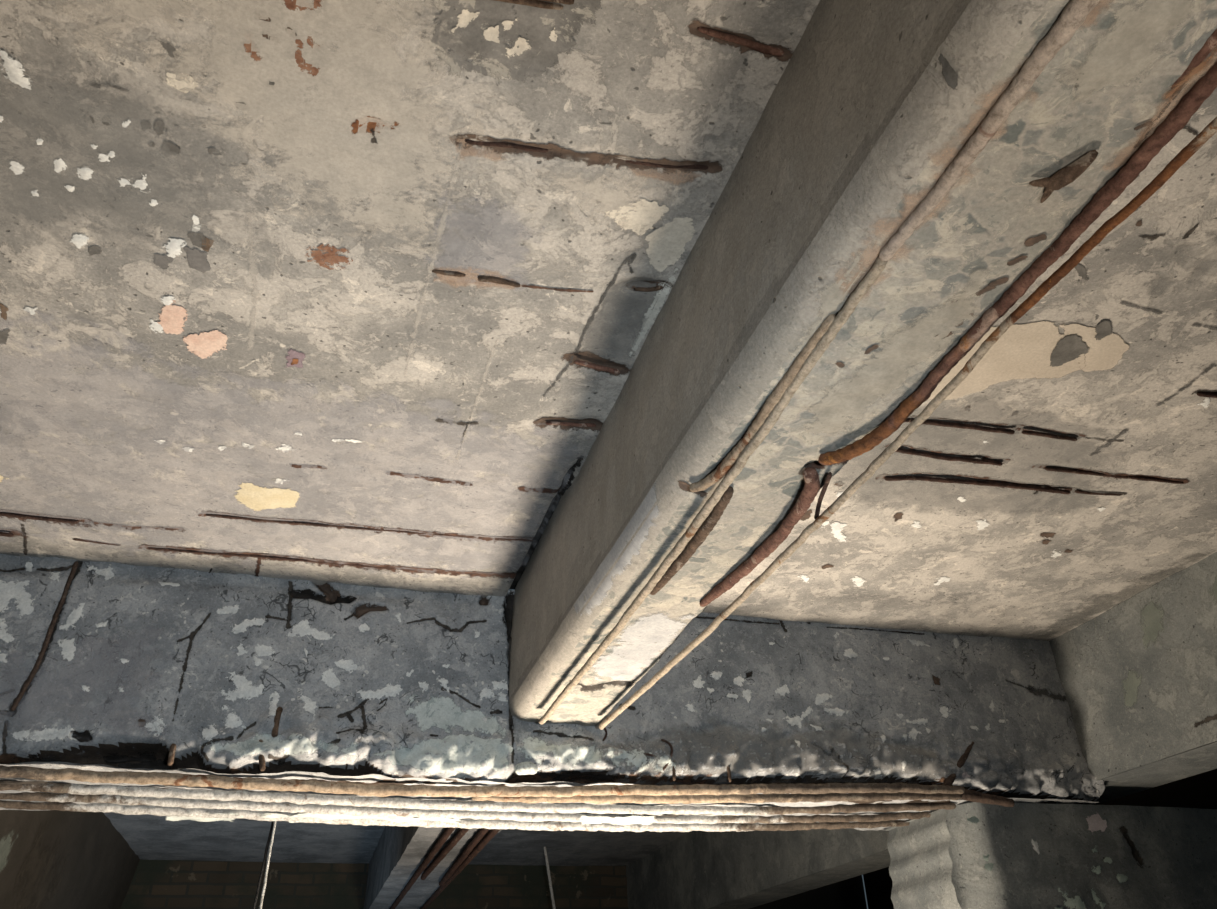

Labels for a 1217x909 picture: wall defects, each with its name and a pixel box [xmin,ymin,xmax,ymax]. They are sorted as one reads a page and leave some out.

spalling [84,115,181,157]
crack [1120,302,1162,314]
crack [1192,323,1217,331]
spalling [533,0,1217,730]
crack [1157,364,1214,406]
crack [875,416,1190,495]
spalling [0,561,1015,909]